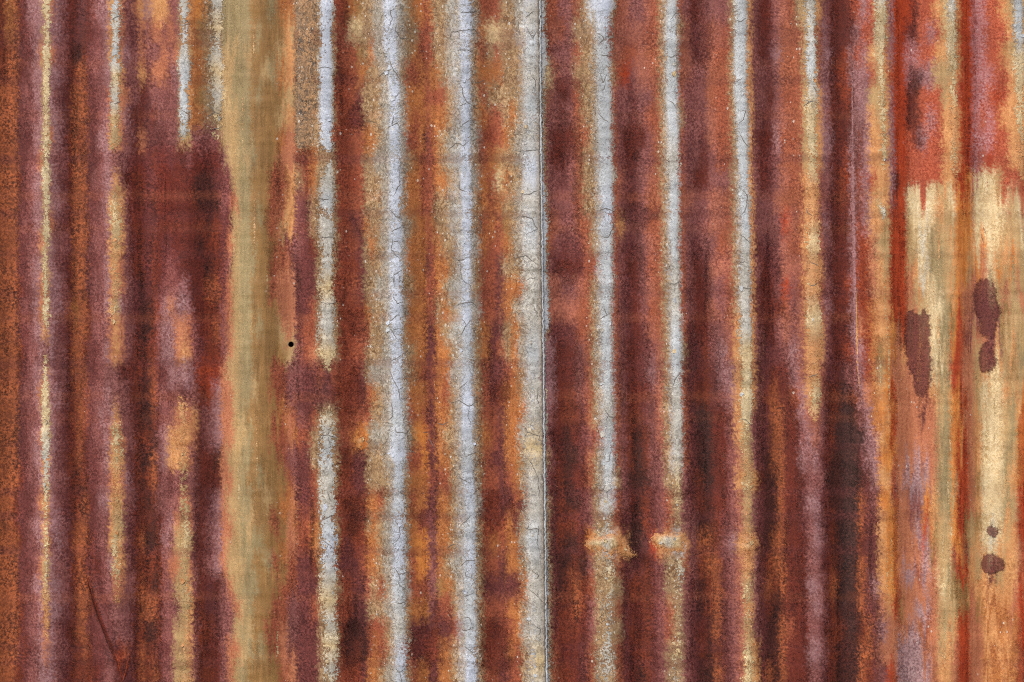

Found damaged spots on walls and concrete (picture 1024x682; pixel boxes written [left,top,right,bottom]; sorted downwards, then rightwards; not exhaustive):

rust [126,138,233,682]
rust [263,18,376,682]
crack [377,8,405,127]
crack [388,174,480,452]
crack [451,80,484,149]
rust [478,332,526,682]
crack [516,191,538,281]
rust [548,323,591,682]
rust [615,243,659,682]
rust [684,233,735,682]
rust [753,0,938,682]
rust [974,270,1002,372]